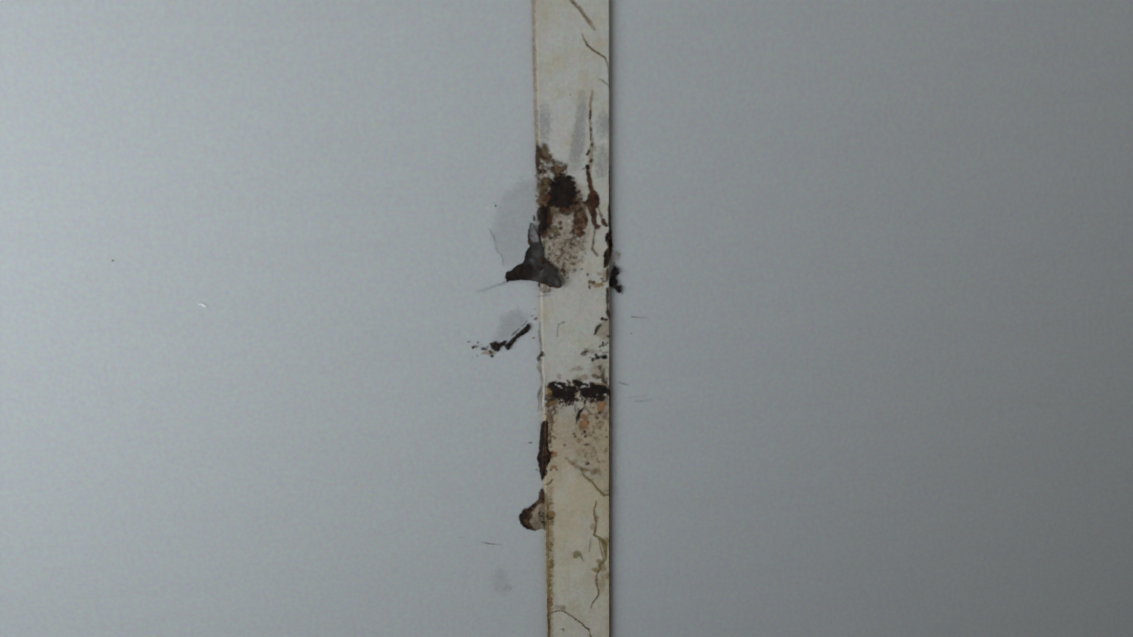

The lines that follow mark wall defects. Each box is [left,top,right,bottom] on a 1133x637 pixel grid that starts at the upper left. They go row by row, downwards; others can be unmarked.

peeling [505,223,562,292]
crack [554,458,609,637]